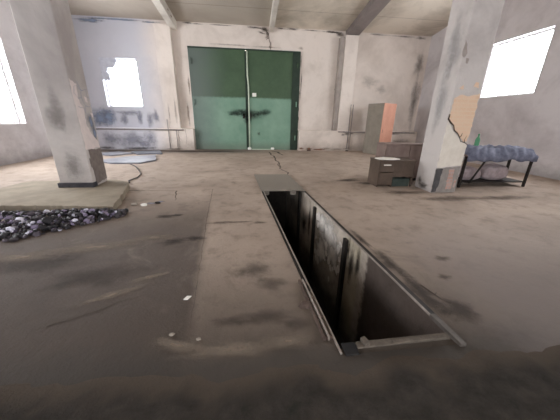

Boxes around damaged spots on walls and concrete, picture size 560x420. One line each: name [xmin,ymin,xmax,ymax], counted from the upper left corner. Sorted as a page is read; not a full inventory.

damp [89,111,114,137]
peeling [450,82,480,142]
spalling [431,166,460,193]